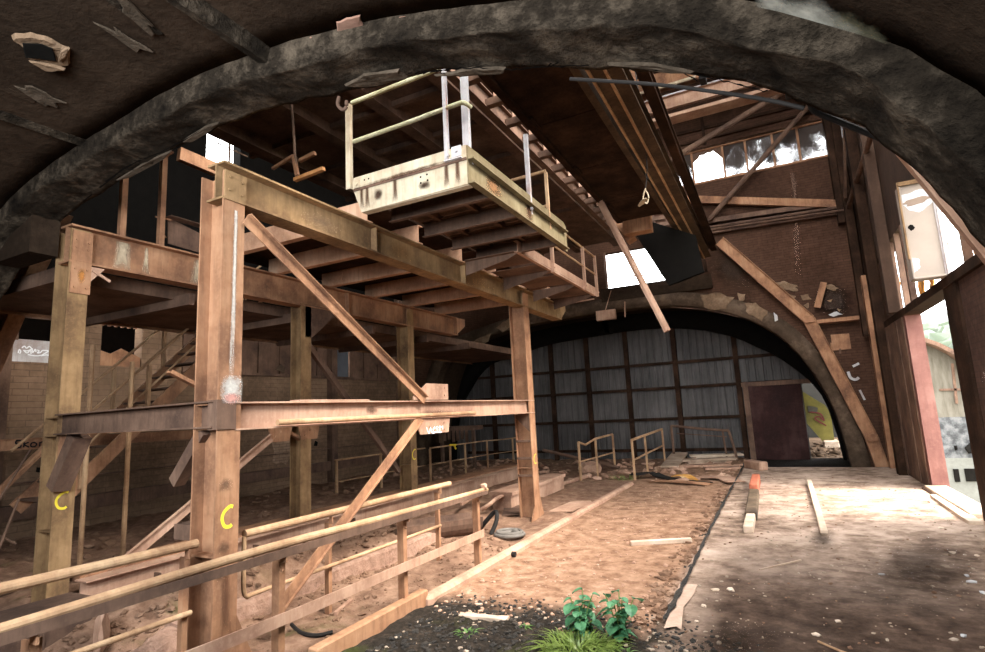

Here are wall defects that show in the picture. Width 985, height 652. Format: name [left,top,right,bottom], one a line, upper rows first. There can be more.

peeling [701,292,778,321]